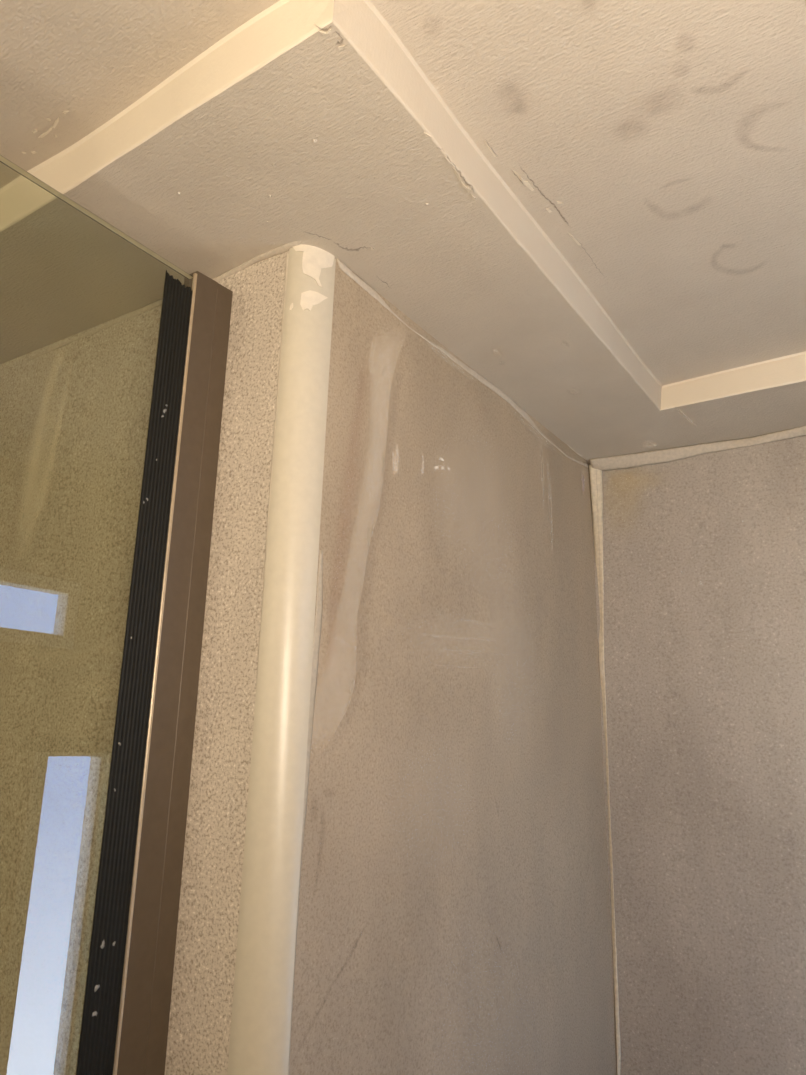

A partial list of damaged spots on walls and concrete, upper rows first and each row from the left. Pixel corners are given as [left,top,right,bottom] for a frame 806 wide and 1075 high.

peeling [290,244,335,311]